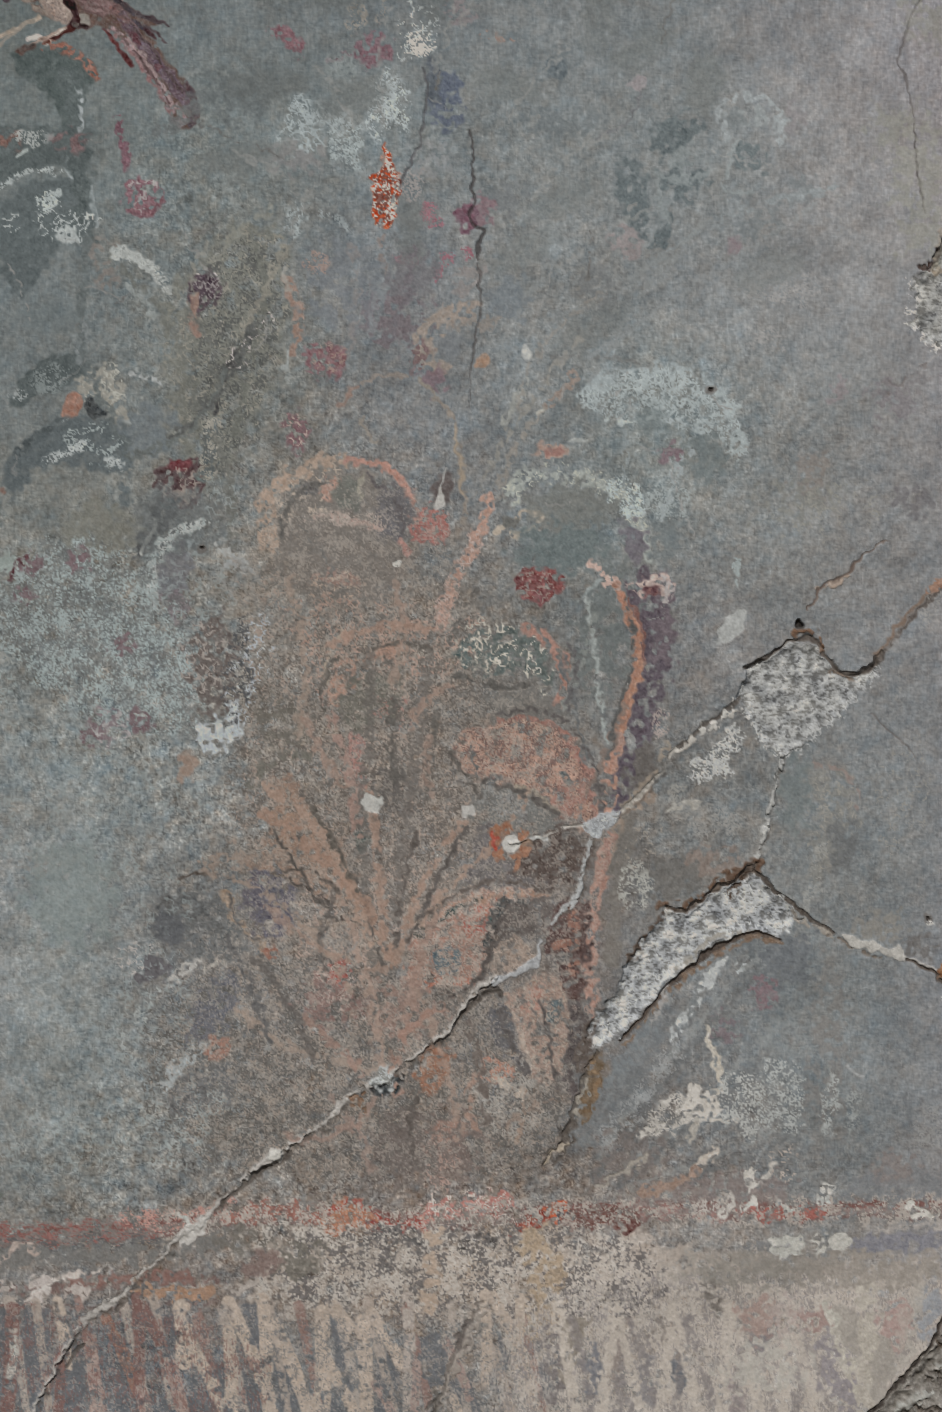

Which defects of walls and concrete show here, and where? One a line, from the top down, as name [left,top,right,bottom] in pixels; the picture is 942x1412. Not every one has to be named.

crack [464,127,491,412]
spalling [906,238,942,353]
crack [871,583,942,662]
spalling [687,628,884,789]
crack [490,695,747,987]
crack [761,753,786,836]
spalling [586,864,805,1049]
crack [751,869,942,985]
crack [369,1066,396,1093]
crack [540,1047,610,1173]
crack [31,1212,212,1412]
spalling [867,1318,942,1412]